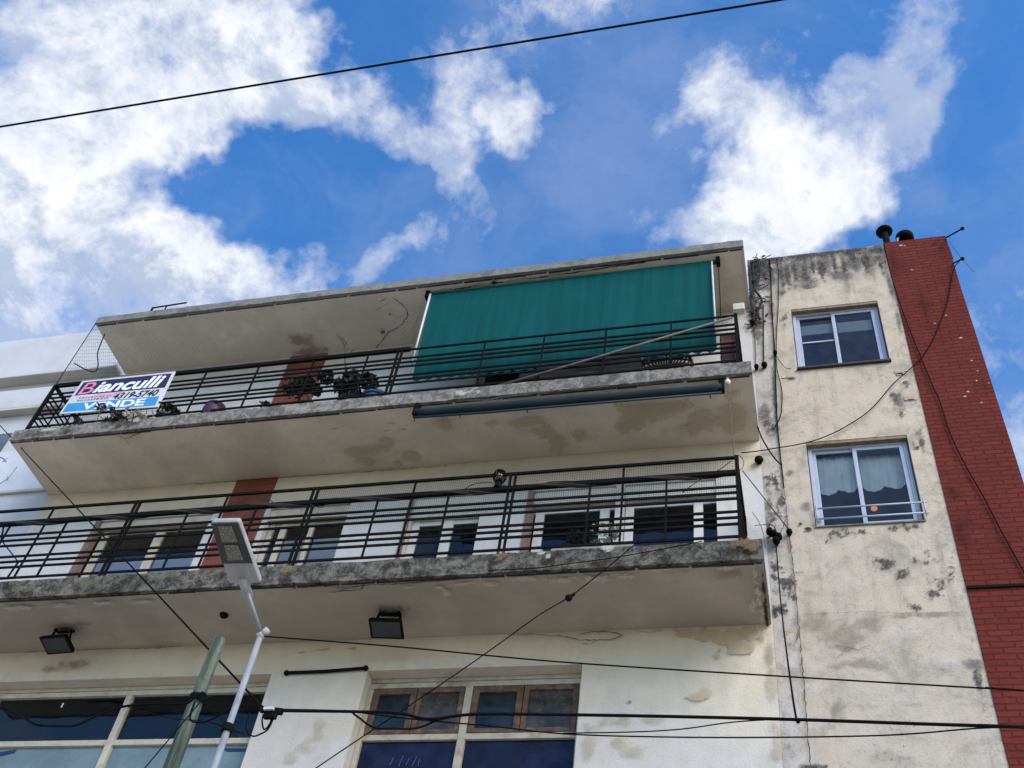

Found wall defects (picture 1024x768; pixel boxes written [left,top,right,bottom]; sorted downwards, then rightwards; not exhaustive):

crack [376,297,419,349]
water stain [750,247,894,339]
water stain [758,388,778,434]
water stain [764,462,793,530]
peeling [512,573,633,584]
peeling [674,568,765,659]
water stain [761,560,798,661]
water stain [872,550,955,616]